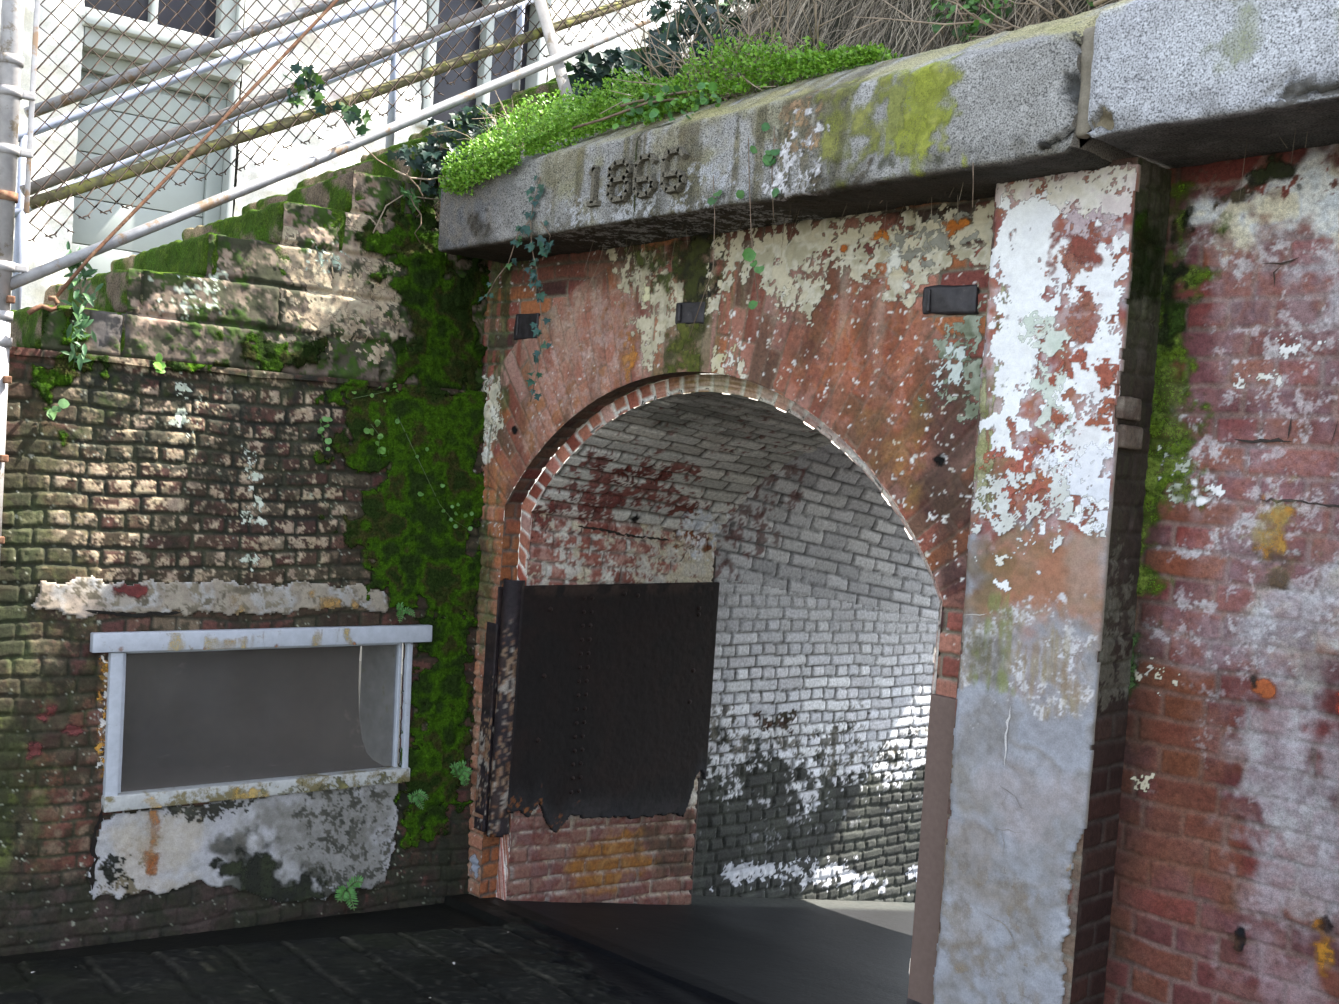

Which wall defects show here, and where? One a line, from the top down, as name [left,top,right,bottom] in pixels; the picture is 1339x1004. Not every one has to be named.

spalling [1062,73,1081,104]
water stain [852,55,963,192]
water stain [808,167,824,188]
spalling [1213,153,1301,209]
peeling [606,248,684,372]
peeling [480,375,504,440]
peeling [705,162,1137,592]
peeling [1233,333,1302,389]
peeling [531,458,672,542]
peeling [1157,445,1225,506]
water stain [709,855,888,894]
water stain [905,865,918,896]